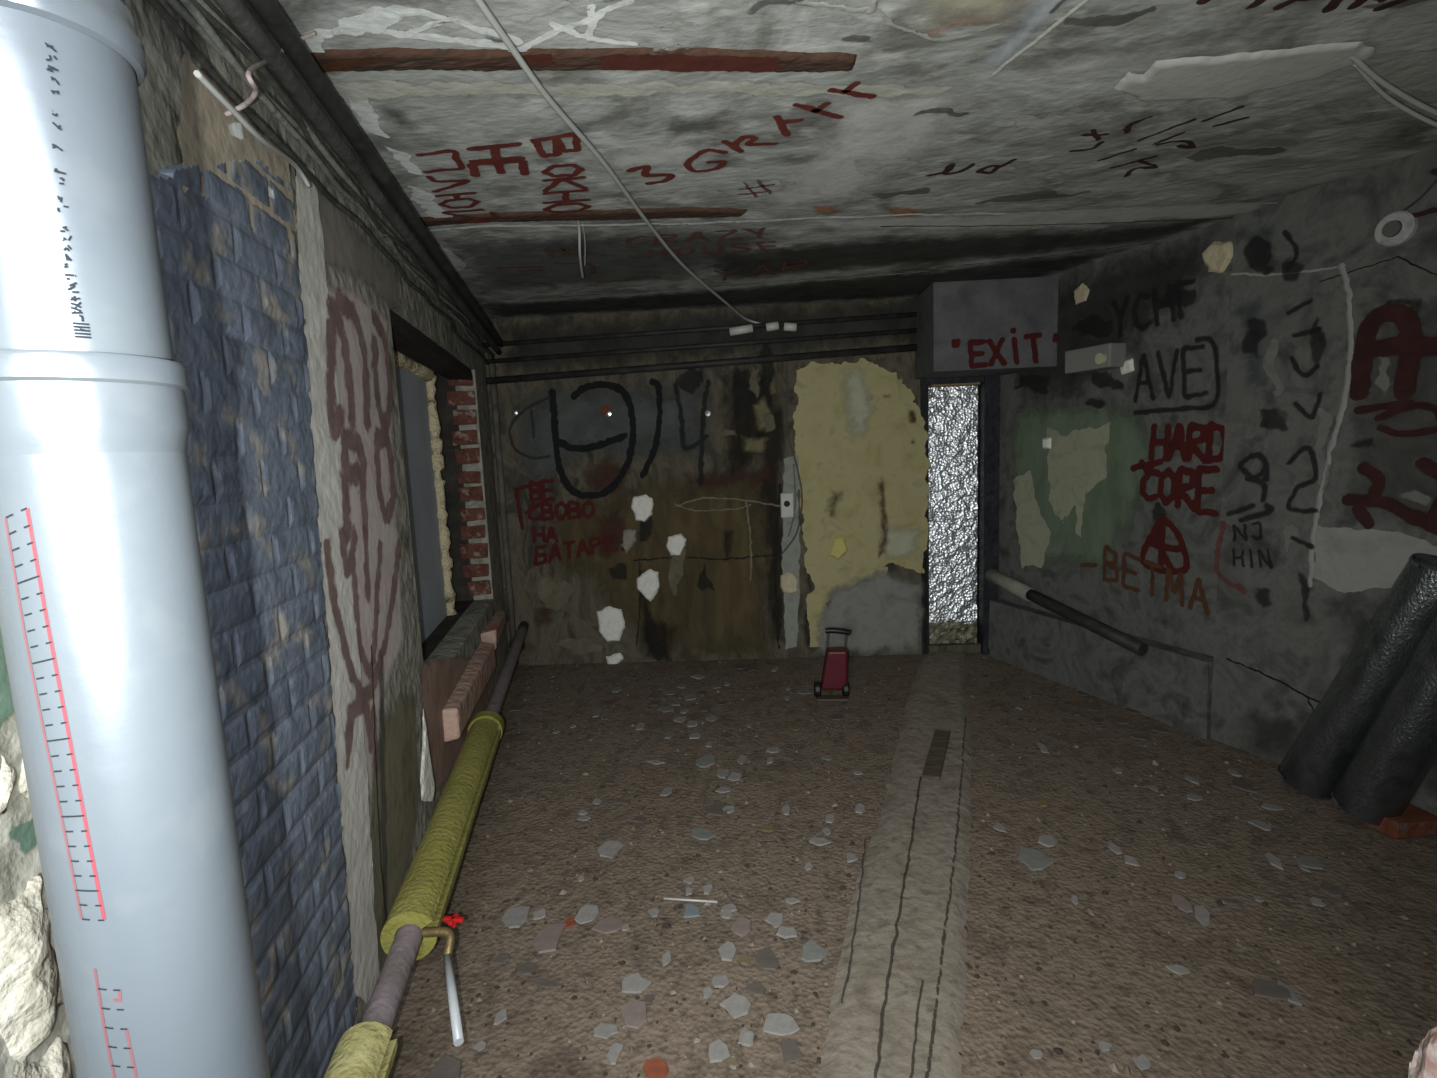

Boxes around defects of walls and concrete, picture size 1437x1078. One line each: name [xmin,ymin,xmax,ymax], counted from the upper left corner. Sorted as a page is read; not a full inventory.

peeling [521,387,706,483]
peeling [722,367,775,452]
peeling [781,358,931,654]
peeling [1013,406,1149,568]
peeling [668,546,686,596]
peeling [0,629,14,727]
spalling [0,755,37,854]
spalling [0,873,73,1078]